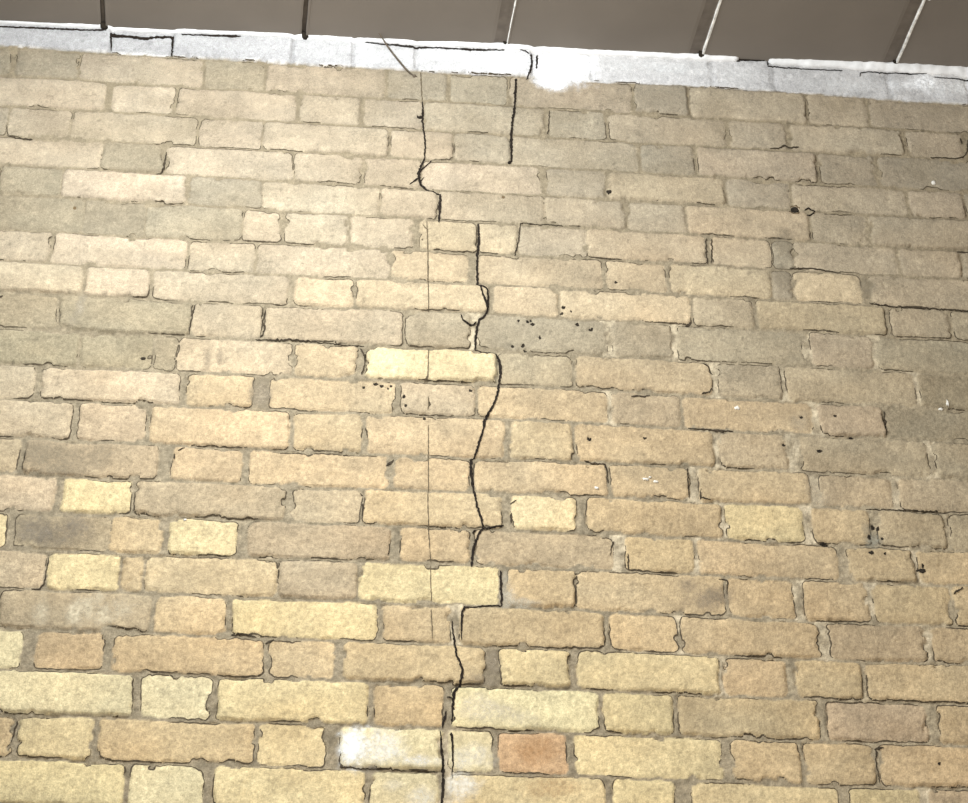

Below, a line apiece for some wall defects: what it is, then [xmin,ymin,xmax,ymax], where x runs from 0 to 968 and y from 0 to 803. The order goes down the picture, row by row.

crack [0,26,241,56]
crack [410,72,442,312]
crack [365,42,538,164]
crack [461,223,504,567]
crack [424,349,503,803]